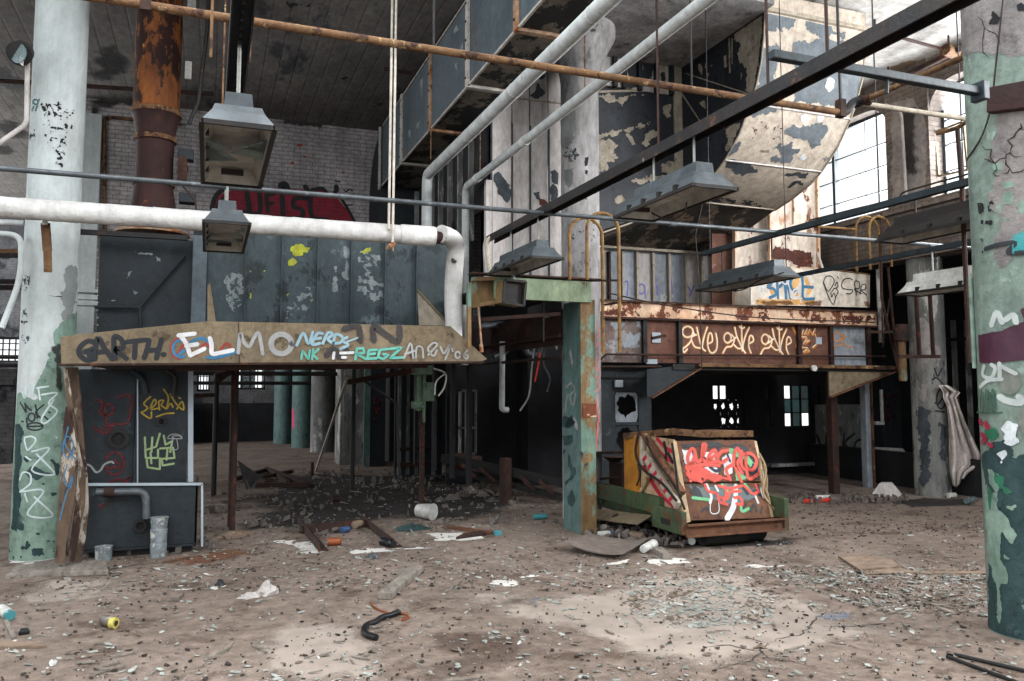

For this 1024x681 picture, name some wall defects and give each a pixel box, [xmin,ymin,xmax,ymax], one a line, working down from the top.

peeling [599,62,666,106]
peeling [698,14,846,93]
peeling [793,72,861,107]
peeling [29,99,74,167]
peeling [493,172,511,203]
peeling [725,105,777,176]
peeling [771,122,829,188]
flaking render [977,111,1024,268]
crack [982,123,1024,177]
corrosion [600,309,640,322]
corrosion [735,300,792,321]
peeling [8,265,78,564]